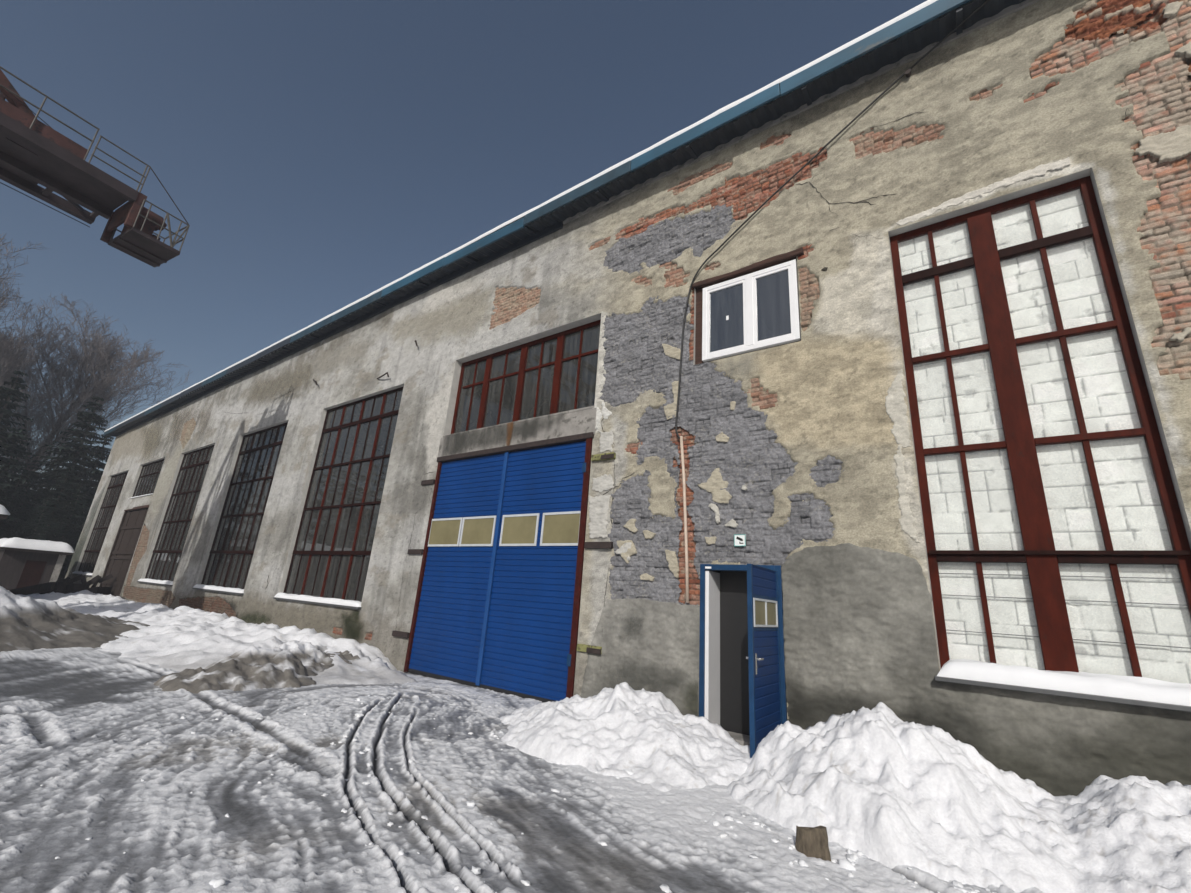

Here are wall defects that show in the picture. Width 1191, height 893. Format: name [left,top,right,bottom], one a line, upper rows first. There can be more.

flaking render [760,134,791,150]
flaking render [849,124,945,159]
crack [795,175,896,241]
flaking render [1024,0,1191,380]
flaking render [489,287,541,330]
peeling [588,147,845,606]